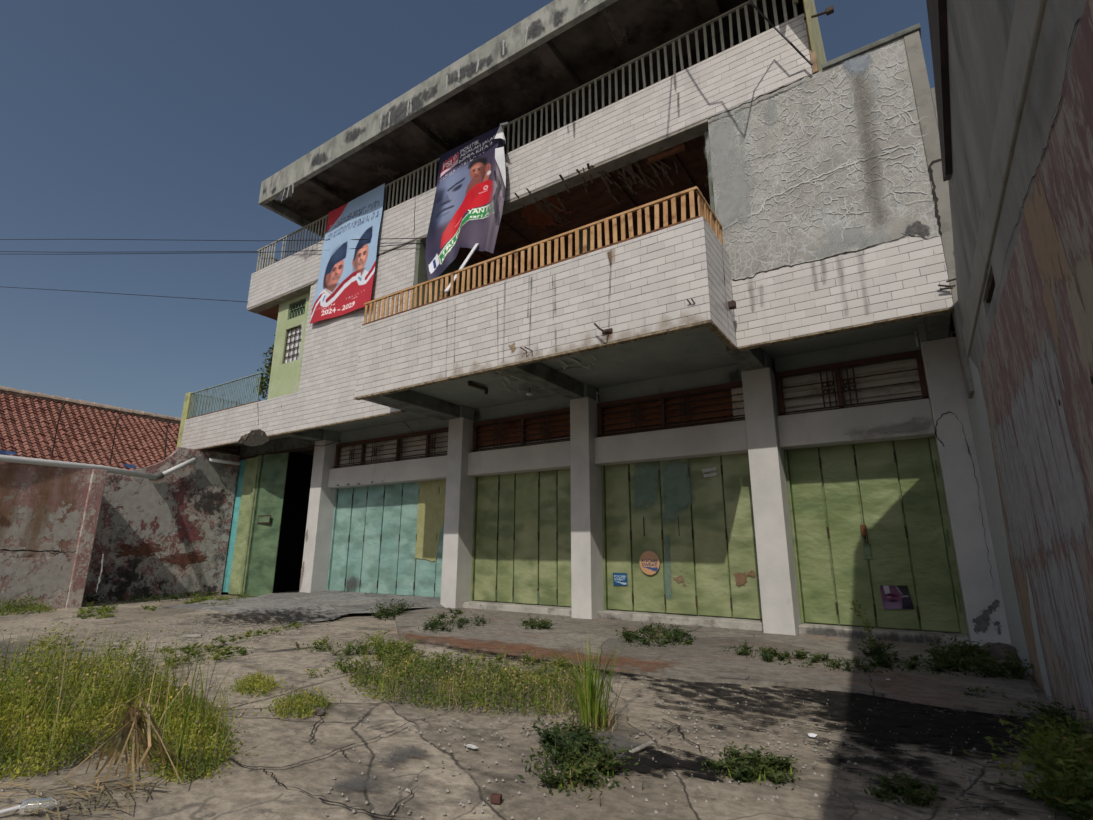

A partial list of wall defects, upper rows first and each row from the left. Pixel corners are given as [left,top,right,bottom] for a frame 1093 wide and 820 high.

water stain [379,40,507,132]
water stain [525,9,566,43]
water stain [844,53,873,81]
water stain [346,127,365,142]
crack [708,56,942,329]
peeling [1065,250,1093,385]
peeling [0,475,85,607]
crack [0,549,104,592]
peeling [102,454,227,597]
spalling [972,600,1001,635]
crack [223,713,451,820]
crack [661,719,717,752]